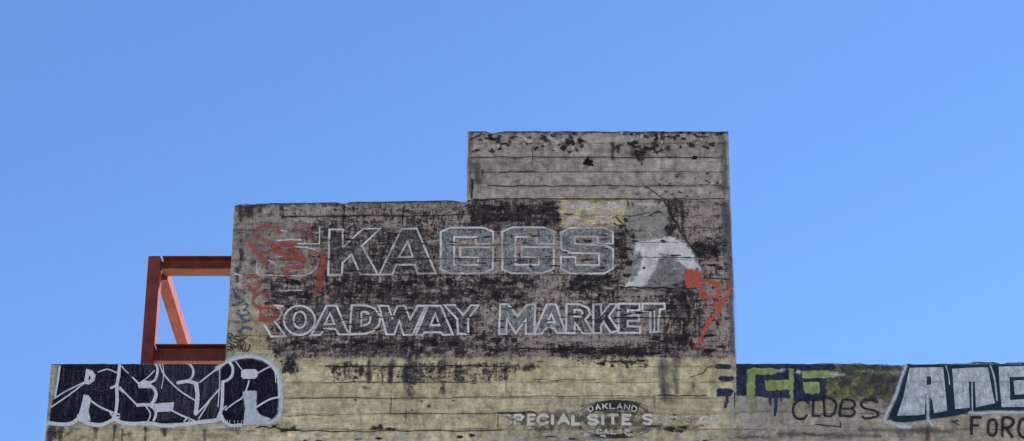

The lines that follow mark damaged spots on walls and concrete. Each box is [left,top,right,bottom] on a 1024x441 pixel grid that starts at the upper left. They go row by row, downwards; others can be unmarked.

spalling [470,132,593,166]
spalling [614,131,724,160]
crack [282,149,729,289]
leakage [333,359,468,396]